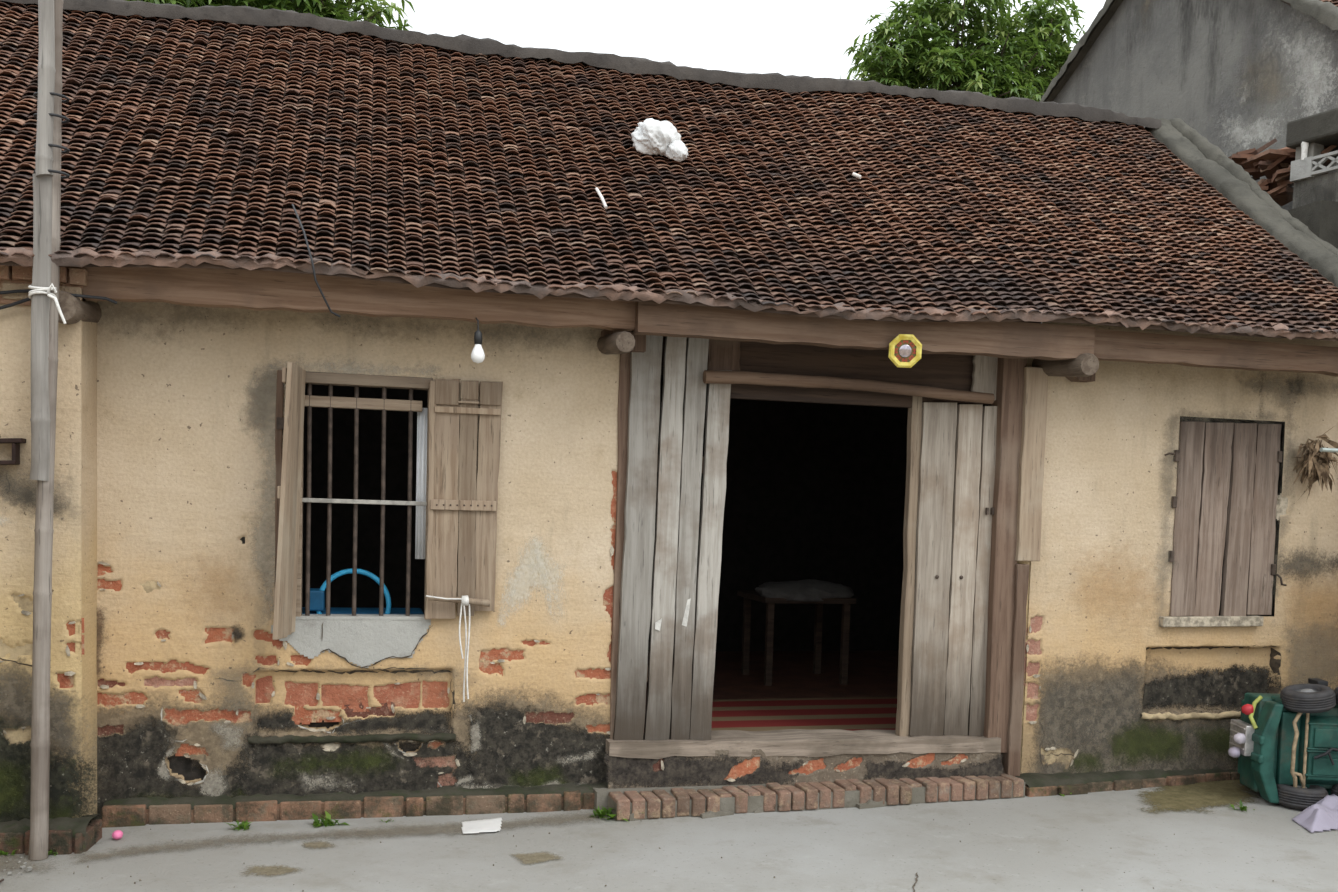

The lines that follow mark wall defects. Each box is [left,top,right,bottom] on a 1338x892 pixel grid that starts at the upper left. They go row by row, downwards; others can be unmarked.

leakage [0,475,36,507]
spalling [97,561,122,591]
leakage [97,609,108,675]
spalling [479,640,550,676]
spalling [523,586,613,735]
leakage [0,661,32,822]
spalling [158,743,226,796]
leakage [49,689,610,833]
leakage [1030,657,1283,813]
leakage [513,852,560,864]